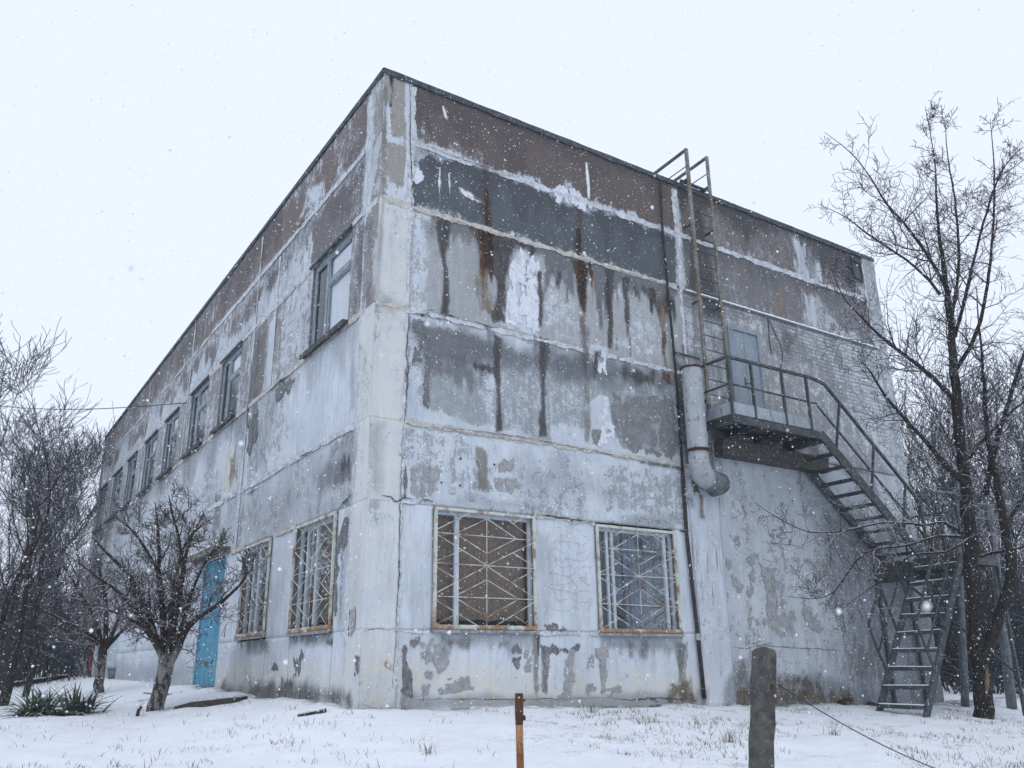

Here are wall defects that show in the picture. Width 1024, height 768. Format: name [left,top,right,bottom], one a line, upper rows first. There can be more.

damp [436,219,451,314]
damp [432,237,512,431]
corrosion [470,190,495,314]
damp [534,270,550,437]
corrosion [572,229,594,315]
damp [593,267,632,372]
peeling [403,465,442,497]
crack [348,309,639,682]
peeling [333,517,348,616]
peeling [726,553,824,638]
peeling [401,636,474,698]
peeling [511,623,622,702]